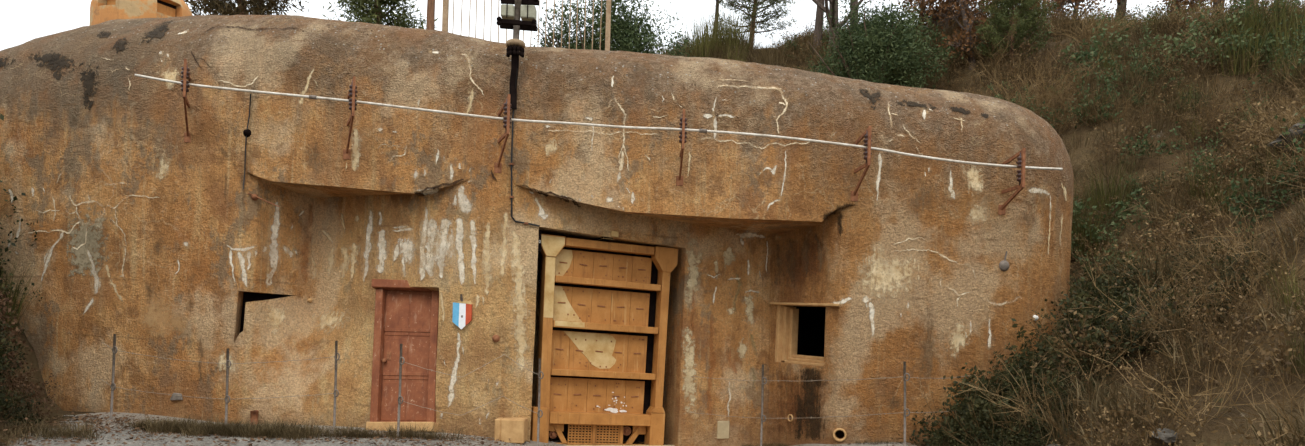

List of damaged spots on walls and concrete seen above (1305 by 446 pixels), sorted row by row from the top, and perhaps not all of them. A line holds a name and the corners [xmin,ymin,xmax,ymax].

damp [227,202,304,286]
damp [312,150,530,370]
damp [441,333,464,416]